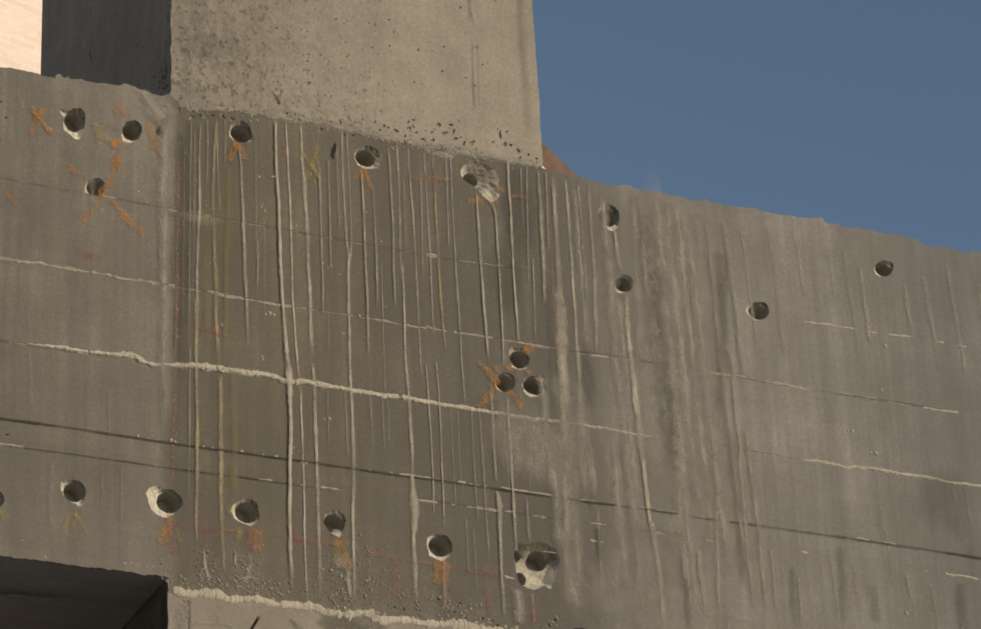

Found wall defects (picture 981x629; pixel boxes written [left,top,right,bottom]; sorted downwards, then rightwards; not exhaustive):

damp [183,129,220,533]
damp [272,123,320,585]
damp [300,126,324,344]
damp [341,133,354,457]
damp [403,301,413,456]
damp [389,146,460,337]
spalling [460,160,500,202]
damp [476,196,489,350]
damp [493,160,772,628]
damp [346,491,355,594]
damp [410,475,418,588]
spalling [514,542,560,590]